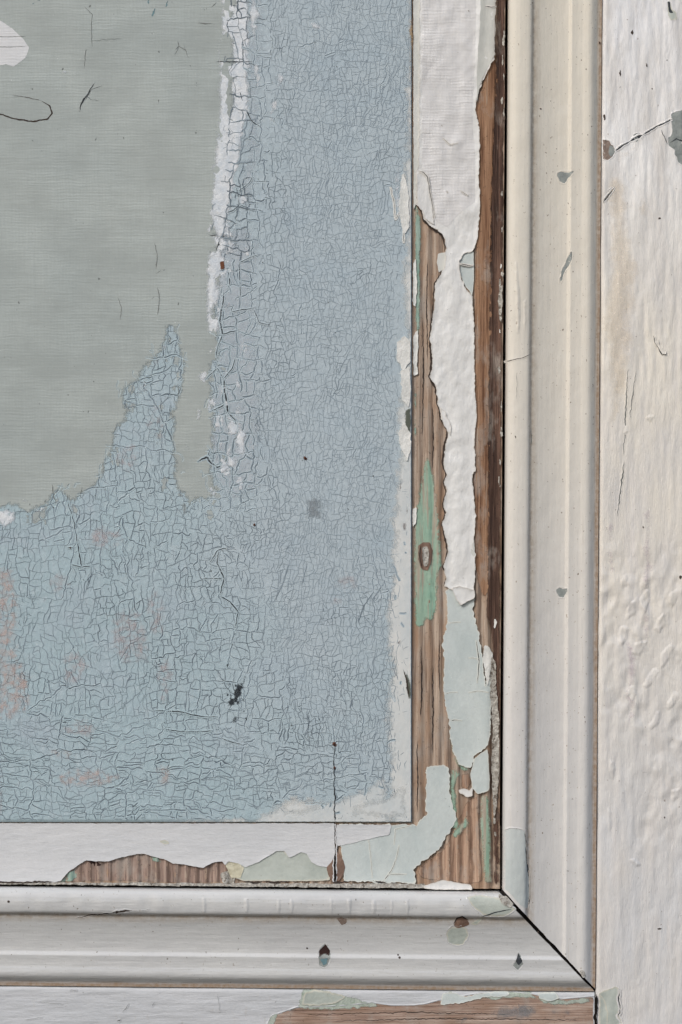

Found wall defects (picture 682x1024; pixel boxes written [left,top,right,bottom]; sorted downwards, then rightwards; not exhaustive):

crack [80,6,121,109]
crack [0,95,53,122]
crack [614,118,673,152]
crack [204,175,269,433]
crack [197,448,228,469]
peeling [0,0,531,947]
crack [52,485,92,569]
crack [202,547,240,627]
crack [330,748,338,882]
peeling [316,943,332,969]
peeling [299,989,377,1010]
peeling [441,987,624,1024]